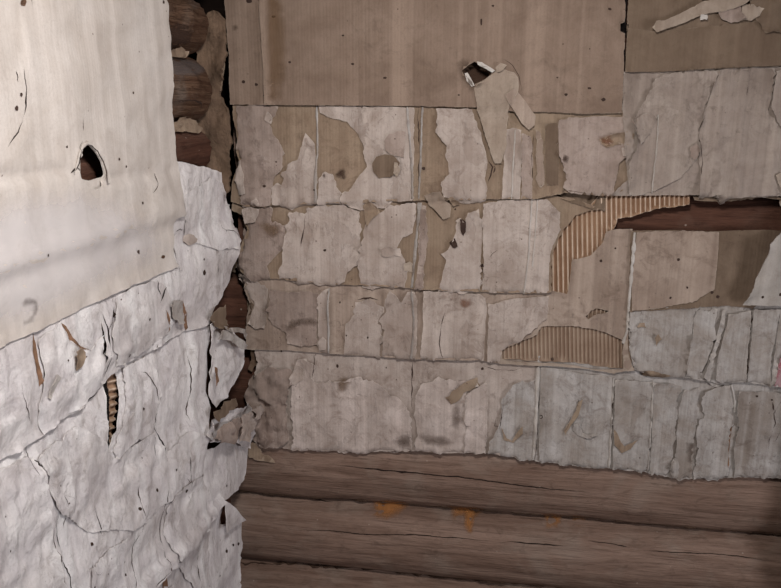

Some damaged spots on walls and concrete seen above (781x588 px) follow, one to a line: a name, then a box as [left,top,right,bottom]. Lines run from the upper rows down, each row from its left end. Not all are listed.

crack [103,310,116,374]
crack [184,357,192,423]
crack [96,372,171,587]
crack [334,464,583,492]
crack [54,495,72,588]
crack [308,530,485,541]